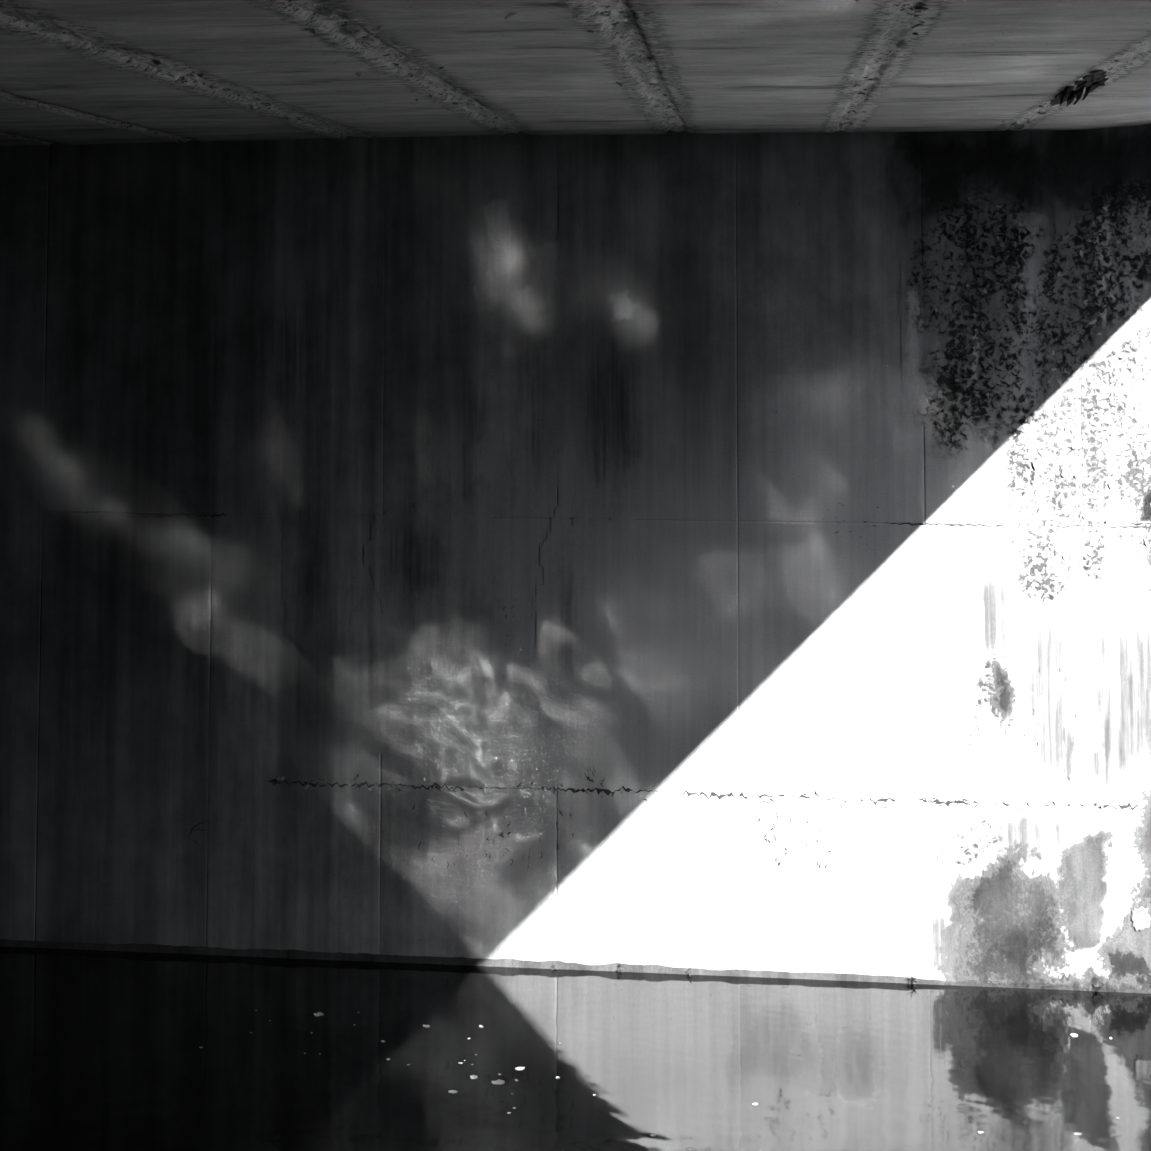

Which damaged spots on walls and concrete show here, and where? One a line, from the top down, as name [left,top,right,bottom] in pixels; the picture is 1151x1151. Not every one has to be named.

water stain [899,260,931,427]
water stain [968,312,983,412]
water stain [1005,213,1046,332]
peeling [910,178,1151,603]
water stain [1088,213,1117,333]
crack [267,706,1144,872]
water stain [966,581,1016,749]
water stain [1031,630,1073,777]
water stain [1094,634,1151,785]
water stain [0,790,1151,994]